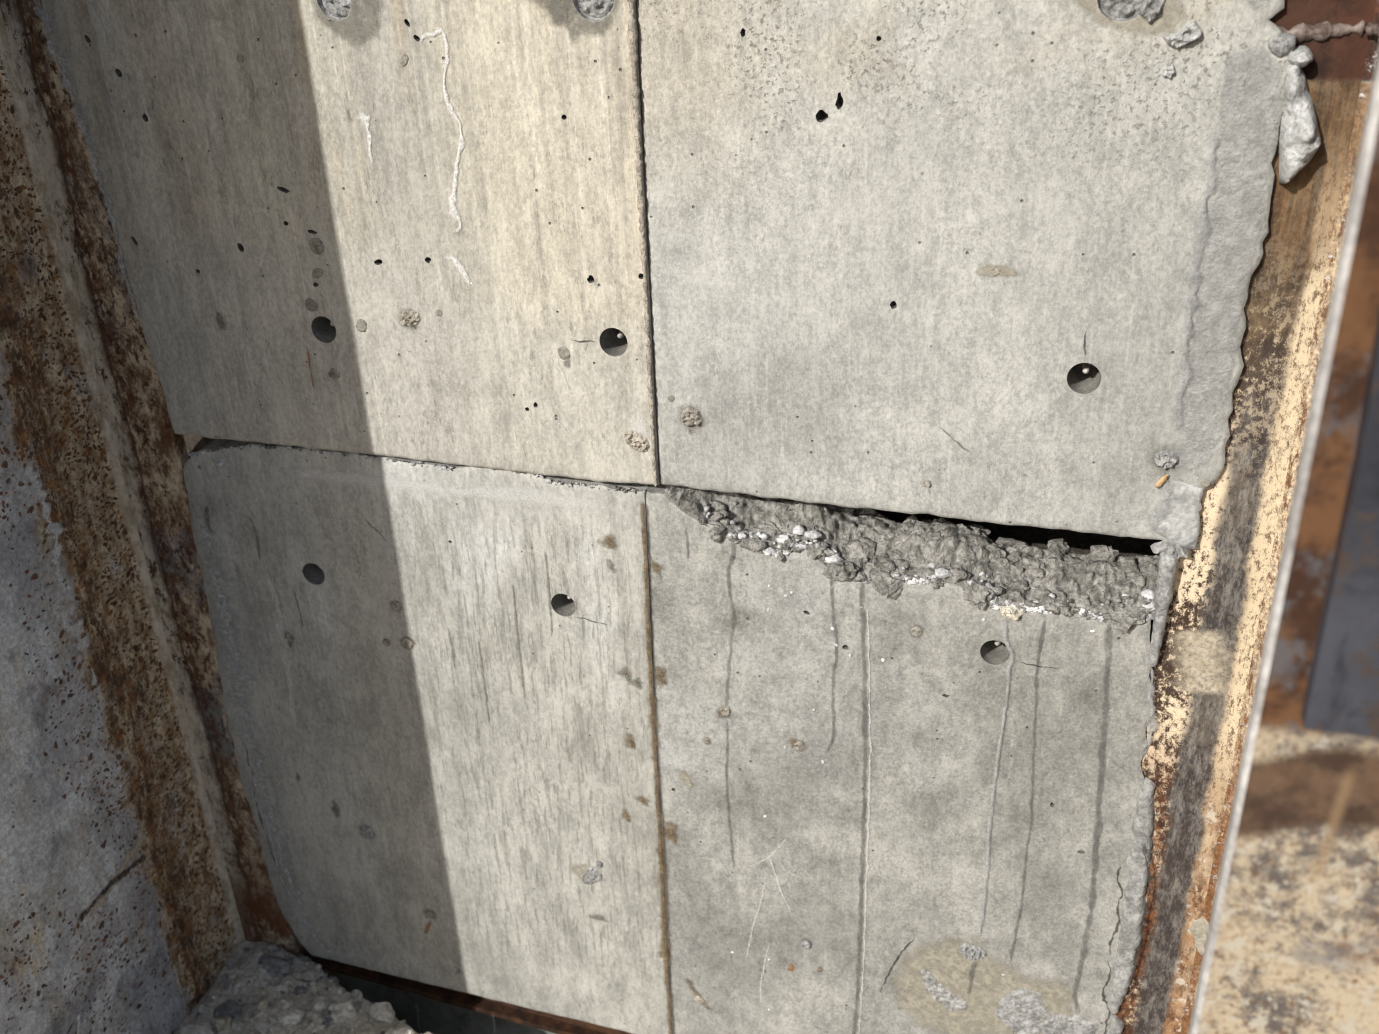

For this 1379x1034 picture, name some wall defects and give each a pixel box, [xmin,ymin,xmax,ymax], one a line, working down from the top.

peeling [1138,0,1166,24]
peeling [1162,20,1203,49]
water stain [727,535,807,596]
water stain [893,574,944,589]
peeling [1000,606,1024,621]
rust [618,667,666,689]
water stain [988,599,1111,925]
water stain [851,574,873,1034]